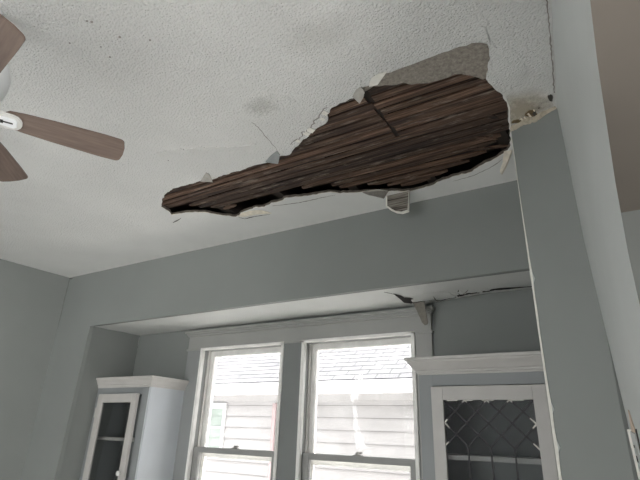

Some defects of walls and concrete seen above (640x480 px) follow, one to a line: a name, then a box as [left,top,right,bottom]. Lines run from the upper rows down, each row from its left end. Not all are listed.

spalling [352,26,490,104]
crack [251,107,328,150]
spalling [510,94,557,131]
crack [445,286,532,298]